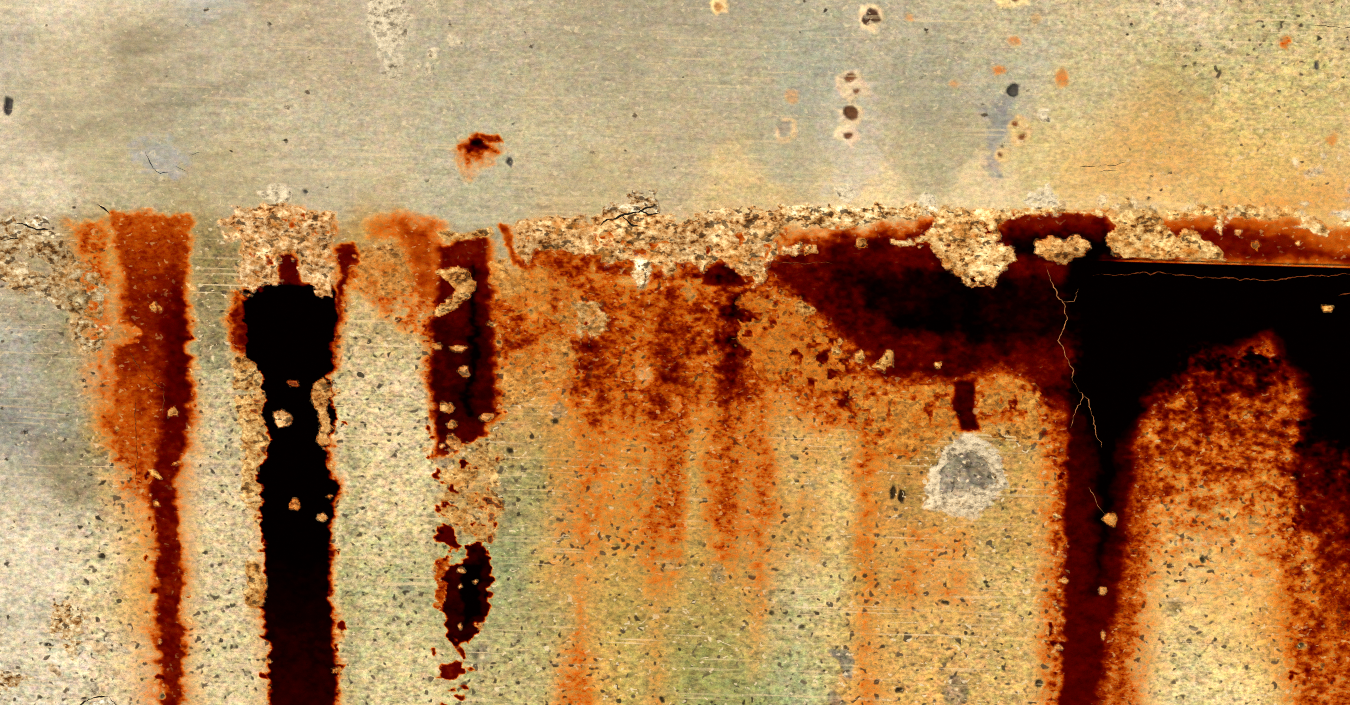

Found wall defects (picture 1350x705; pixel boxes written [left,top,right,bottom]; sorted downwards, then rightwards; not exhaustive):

rust [447,129,511,185]
spalling [774,117,793,138]
peeling [1012,107,1053,140]
spalling [0,211,144,359]
spalling [208,179,1350,395]
peeling [975,373,1046,447]
rust [57,203,215,705]
rust [221,201,1350,705]
spalling [939,452,999,495]